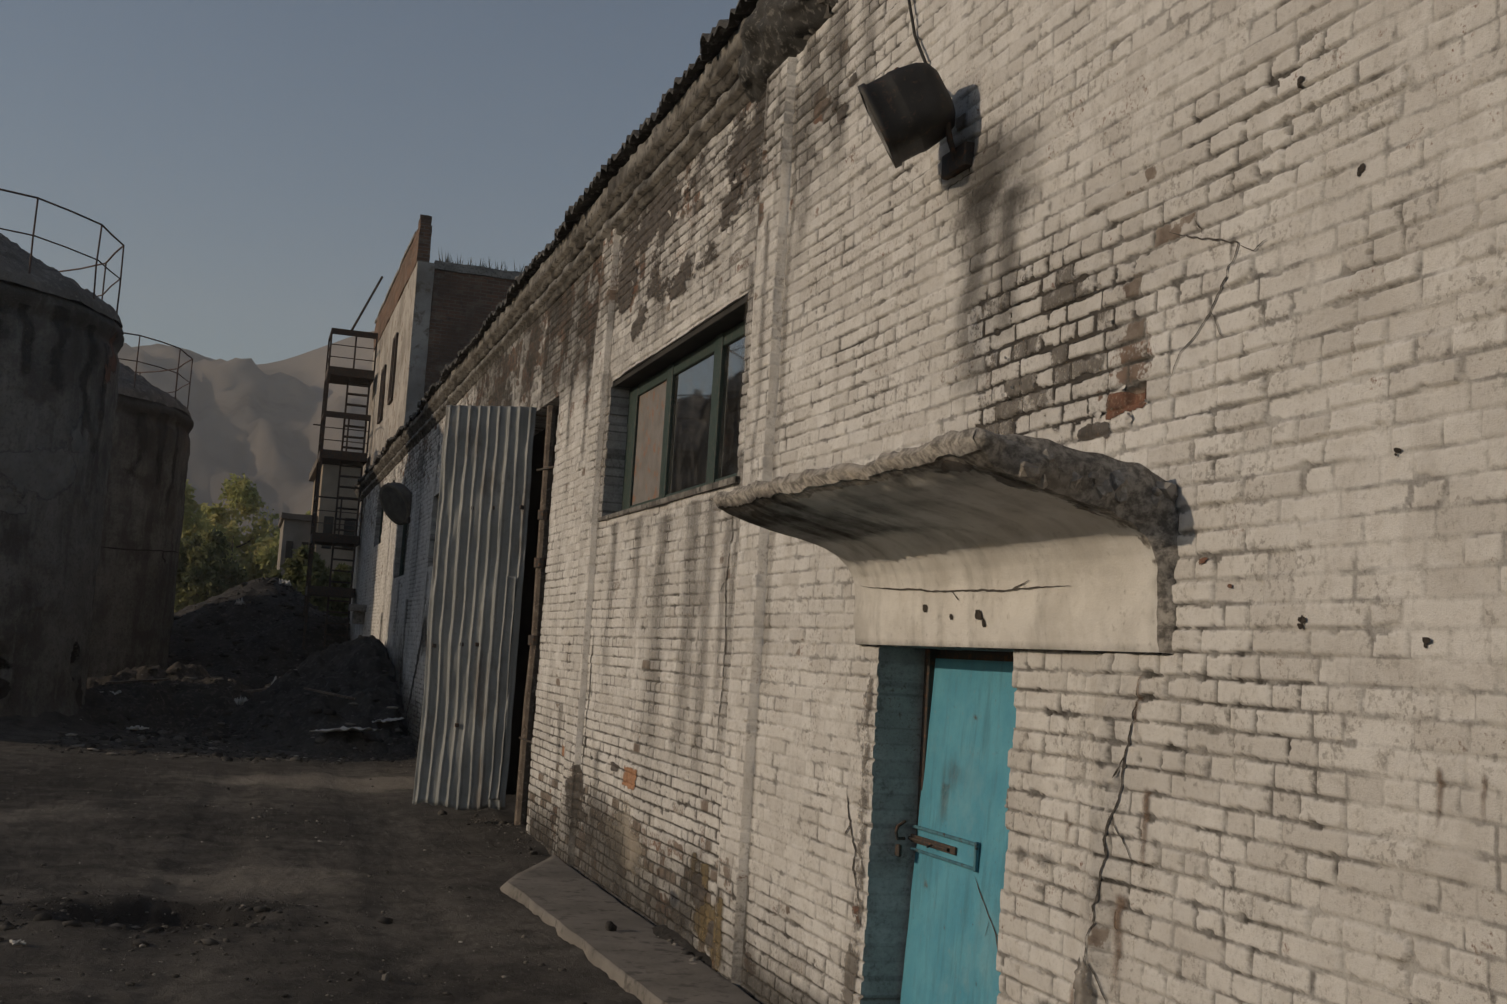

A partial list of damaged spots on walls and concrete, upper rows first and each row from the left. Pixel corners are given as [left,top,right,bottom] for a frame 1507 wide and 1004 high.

water stain [964,181,1018,345]
water stain [0,304,109,453]
peeling [970,243,1148,442]
spalling [935,460,1038,492]
crack [863,580,1069,599]
peeling [562,745,587,828]
peeling [605,762,643,876]
crack [1082,674,1143,1002]